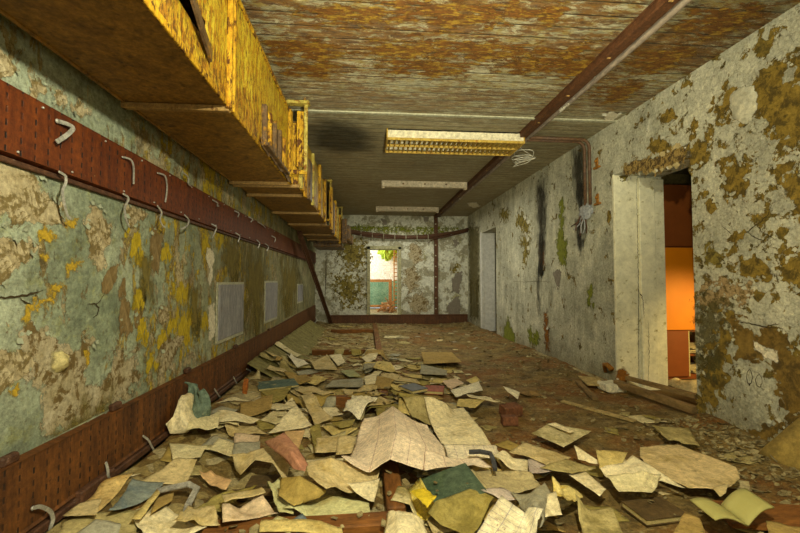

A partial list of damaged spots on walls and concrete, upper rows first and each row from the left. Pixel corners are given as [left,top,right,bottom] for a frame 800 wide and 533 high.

crack [0,290,43,304]
peeling [0,163,67,288]
peeling [0,200,148,437]
peeling [206,247,215,285]
peeling [207,303,216,341]
peeling [329,234,373,313]
peeling [401,242,432,314]
peeling [447,263,463,314]
water stain [537,183,547,312]
water stain [561,149,587,276]
spalling [619,106,758,215]
peeling [710,55,800,223]